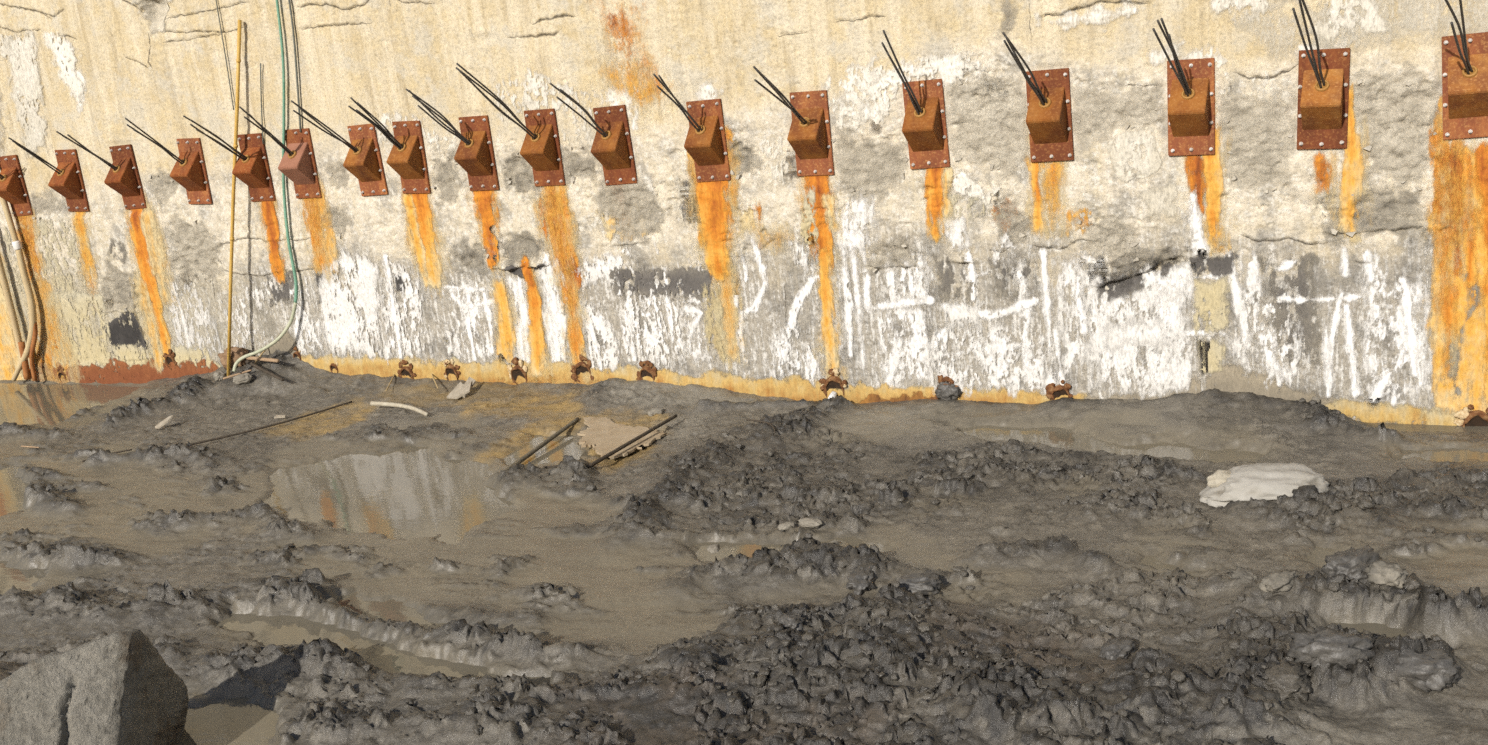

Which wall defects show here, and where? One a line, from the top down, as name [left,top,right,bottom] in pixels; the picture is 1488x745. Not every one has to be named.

rust [0,214,80,383]
rust [126,197,173,372]
rust [259,201,285,283]
rust [402,193,443,294]
rust [473,185,587,379]
water stain [3,188,1480,426]
rust [687,128,847,378]
rust [924,167,953,242]
rust [1184,128,1231,256]
rust [1314,84,1367,242]
rust [1426,97,1488,414]